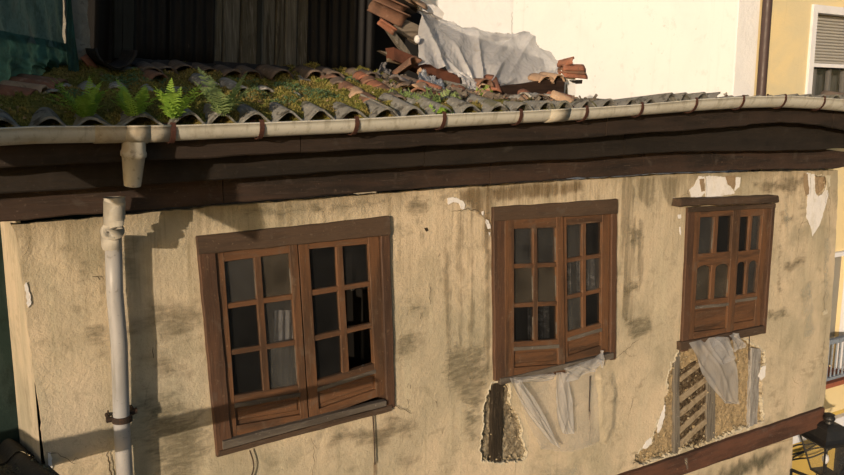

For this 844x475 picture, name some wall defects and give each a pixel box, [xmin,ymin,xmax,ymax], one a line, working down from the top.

flaking render [447,197,465,209]
flaking render [689,175,741,197]
flaking render [803,173,831,236]
flaking render [478,381,528,465]
flaking render [634,337,767,466]